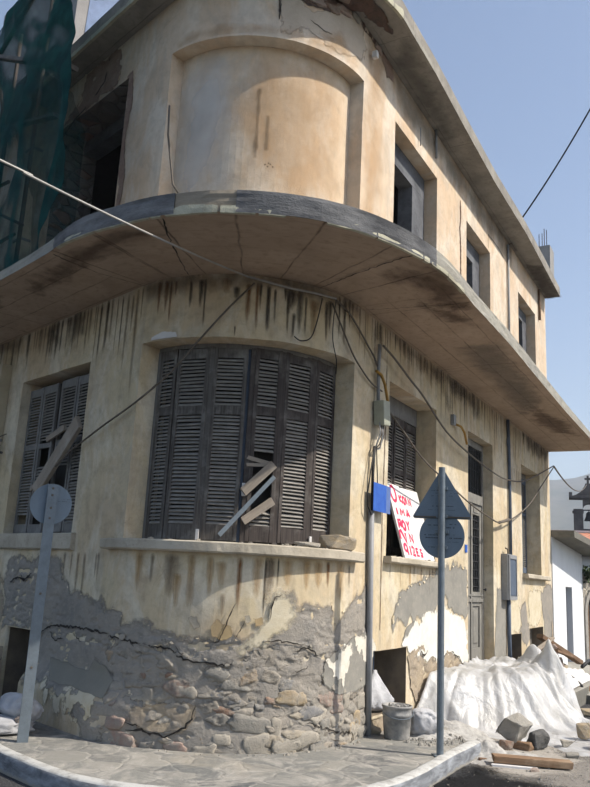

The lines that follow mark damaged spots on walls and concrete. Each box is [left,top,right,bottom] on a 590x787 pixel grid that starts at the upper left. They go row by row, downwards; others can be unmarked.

peeling [281,0,404,82]
crack [163,219,189,275]
water stain [2,298,143,358]
water stain [151,331,177,340]
water stain [260,285,315,332]
water stain [257,560,289,610]
crack [41,624,232,667]
peeling [35,556,383,754]
crack [211,605,245,643]
crack [263,640,321,674]
peeling [392,560,469,705]
peeling [495,583,553,657]